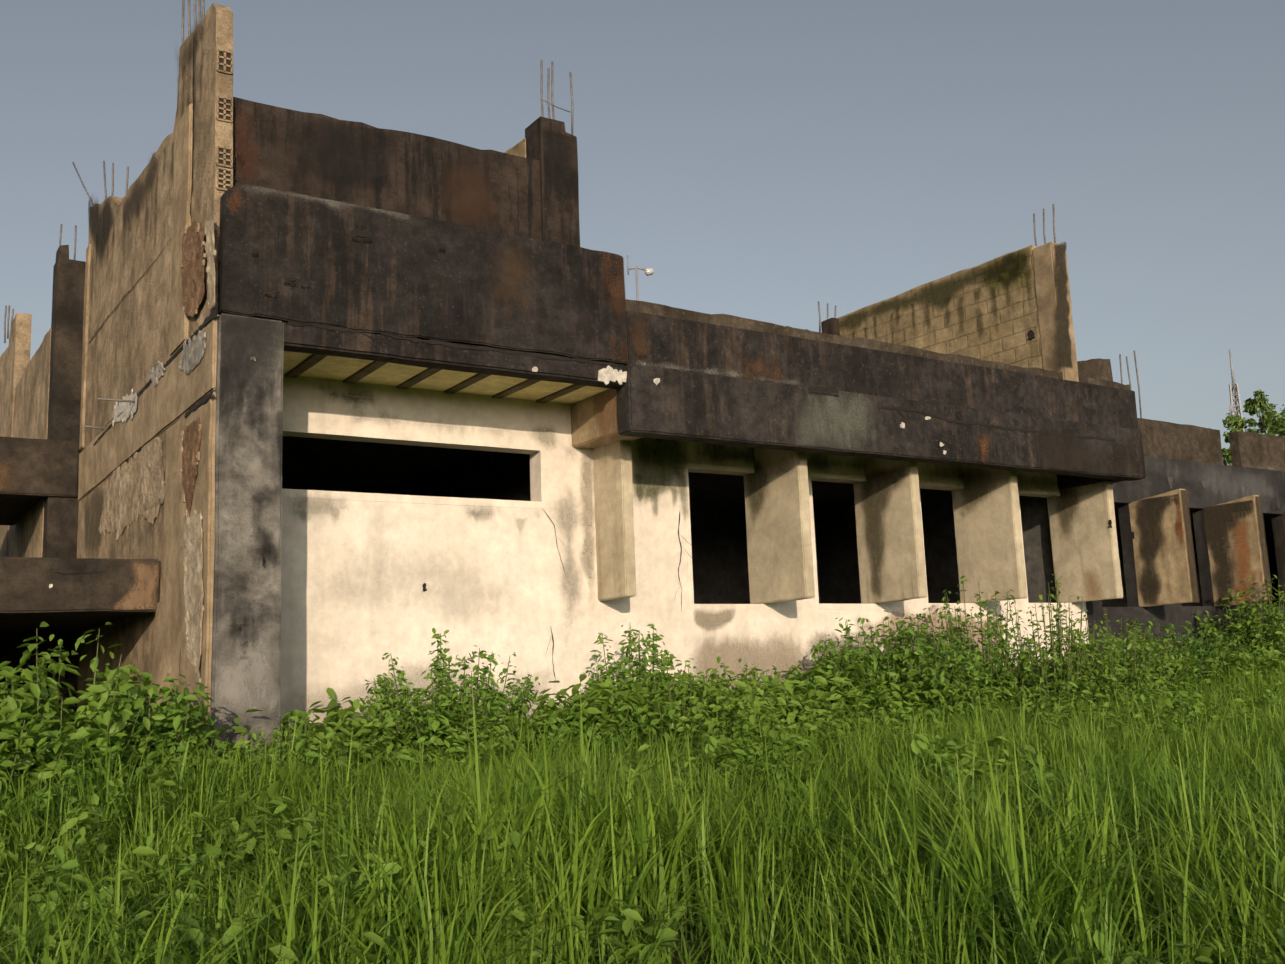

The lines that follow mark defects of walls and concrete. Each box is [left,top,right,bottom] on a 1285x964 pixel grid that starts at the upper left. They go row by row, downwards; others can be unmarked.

spalling [149,214,216,387]
damp [841,252,1030,338]
peeling [84,389,138,429]
spalling [98,437,165,540]
spalling [181,417,205,683]
damp [219,640,275,709]
damp [695,611,1000,693]